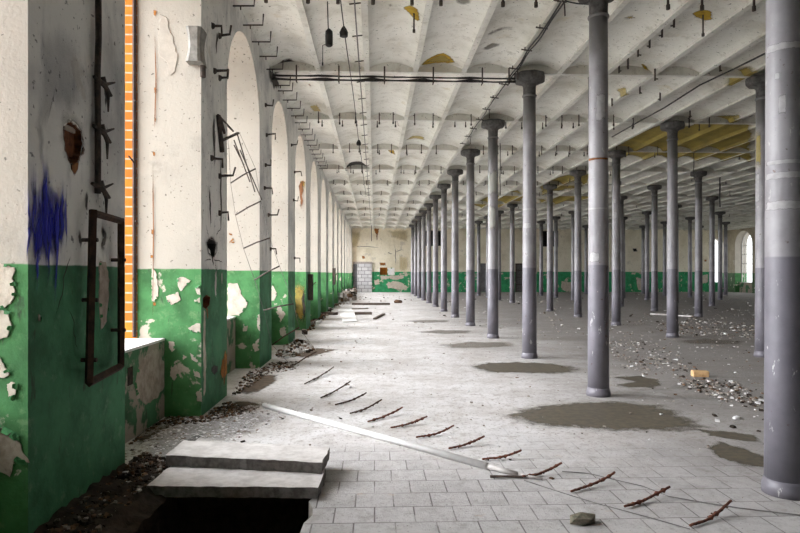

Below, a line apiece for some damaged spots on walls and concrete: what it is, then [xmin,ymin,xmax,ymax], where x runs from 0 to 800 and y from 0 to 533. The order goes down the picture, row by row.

hole [206,237,217,264]
peeling [374,268,408,290]
peeling [0,263,16,340]
peeling [127,268,210,405]
peeling [227,283,261,352]
damp [295,286,306,319]
peeling [0,358,18,401]
damp [475,362,575,374]
peeling [0,425,30,477]
damp [509,401,764,467]
hole [177,497,313,533]